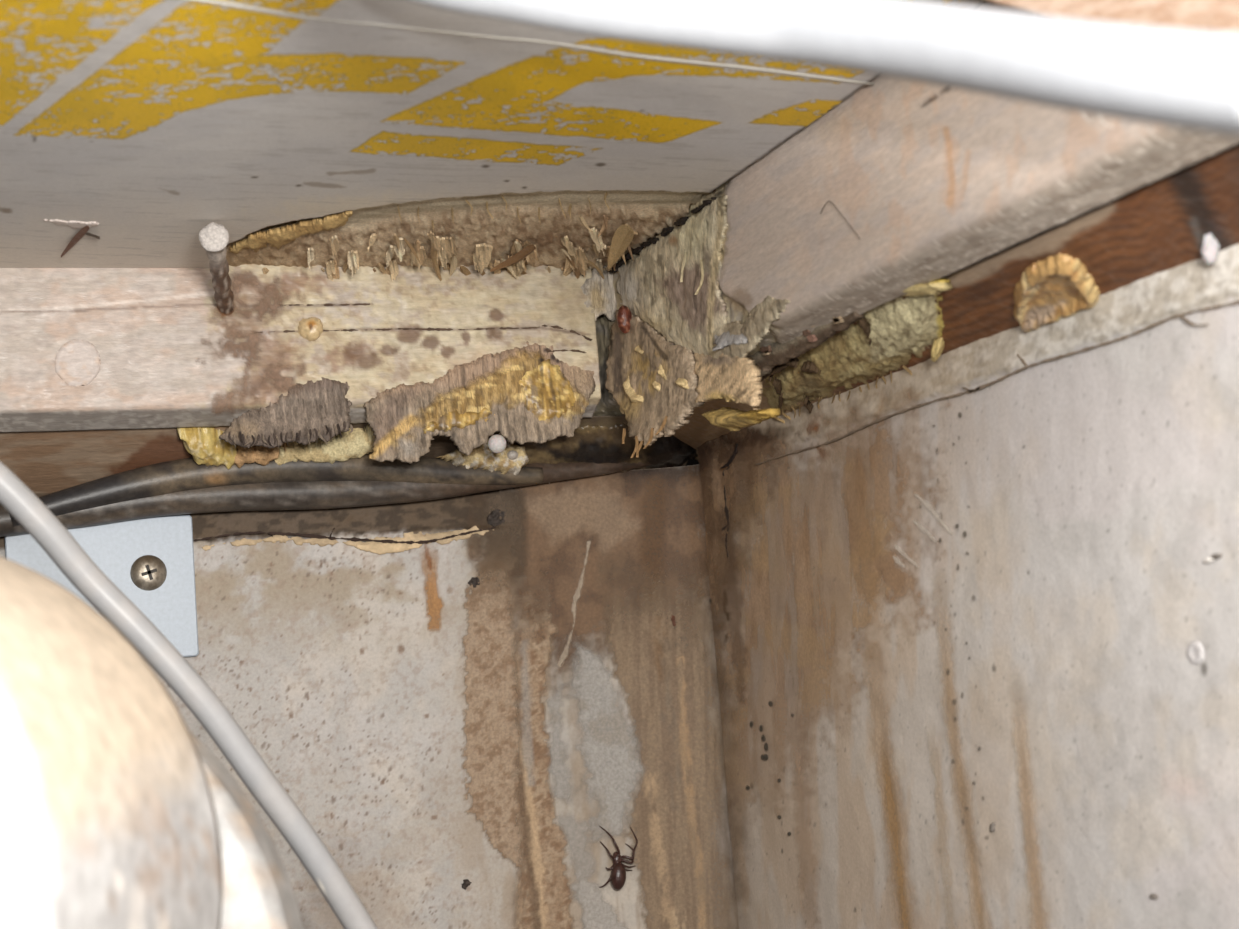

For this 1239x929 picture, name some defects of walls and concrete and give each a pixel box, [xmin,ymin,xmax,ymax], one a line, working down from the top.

water stain [203,273,305,414]
peeling [623,364,689,403]
corrosion [425,553,443,630]
water stain [469,423,836,771]
water stain [841,411,923,658]